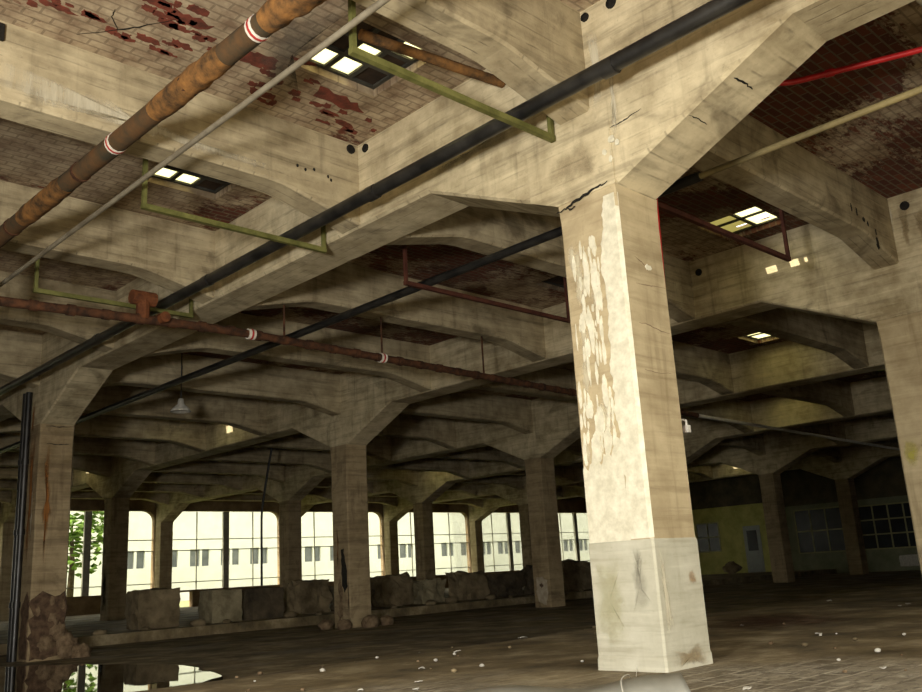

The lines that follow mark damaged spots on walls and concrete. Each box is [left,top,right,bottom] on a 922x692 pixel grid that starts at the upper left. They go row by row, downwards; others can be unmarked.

peeling [26,0,217,58]
peeling [240,51,377,135]
crack [557,181,607,213]
peeling [569,192,654,543]
spalling [18,591,93,661]